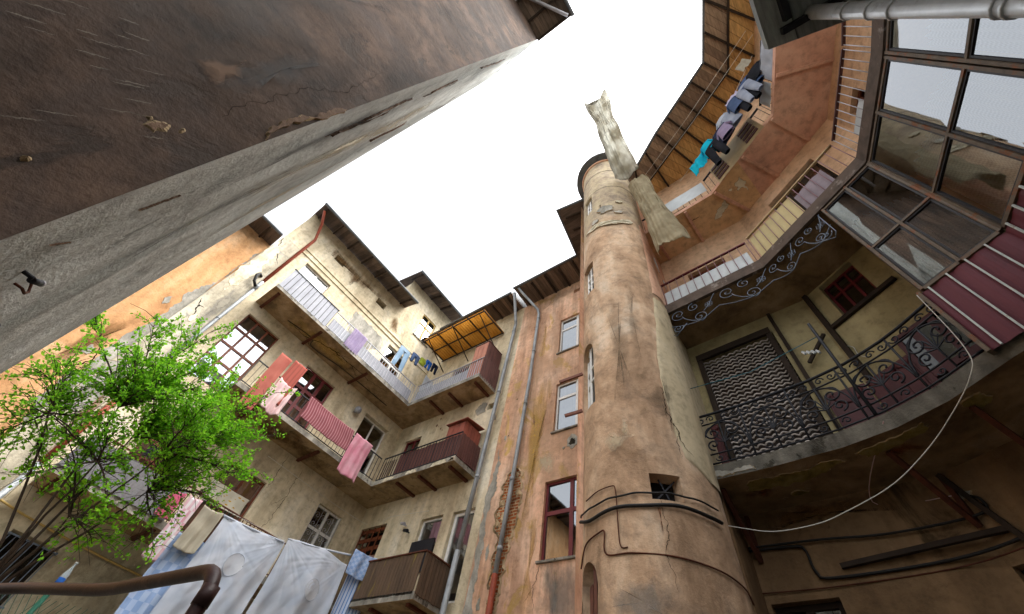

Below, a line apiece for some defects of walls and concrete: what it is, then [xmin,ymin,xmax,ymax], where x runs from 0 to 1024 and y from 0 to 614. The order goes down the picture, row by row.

peeling [143,116,186,134]
peeling [586,200,633,237]
crack [662,389,690,452]
spalling [462,452,524,614]